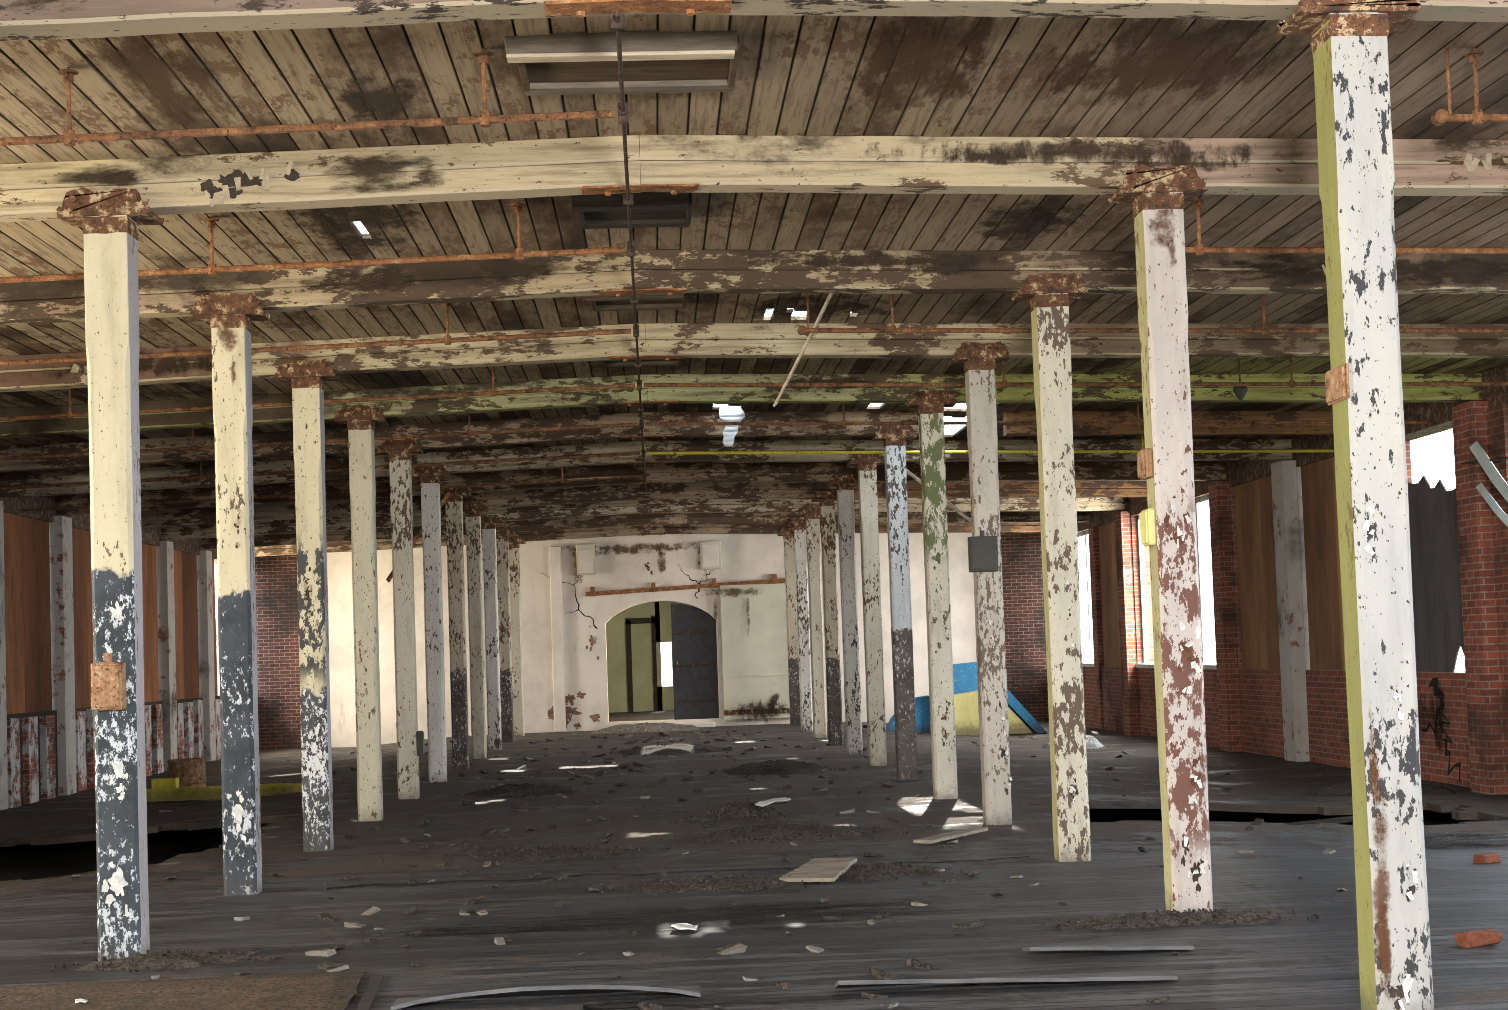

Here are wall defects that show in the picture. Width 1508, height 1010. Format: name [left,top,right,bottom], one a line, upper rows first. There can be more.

leakage [1036,18,1300,105]
peeling [1164,495,1192,565]
peeling [1362,506,1375,555]
peeling [110,601,125,621]
peeling [1177,620,1202,696]
peeling [109,760,128,800]
peeling [1188,757,1203,804]
peeling [226,790,246,841]
peeling [102,862,131,917]
peeling [1181,836,1208,892]